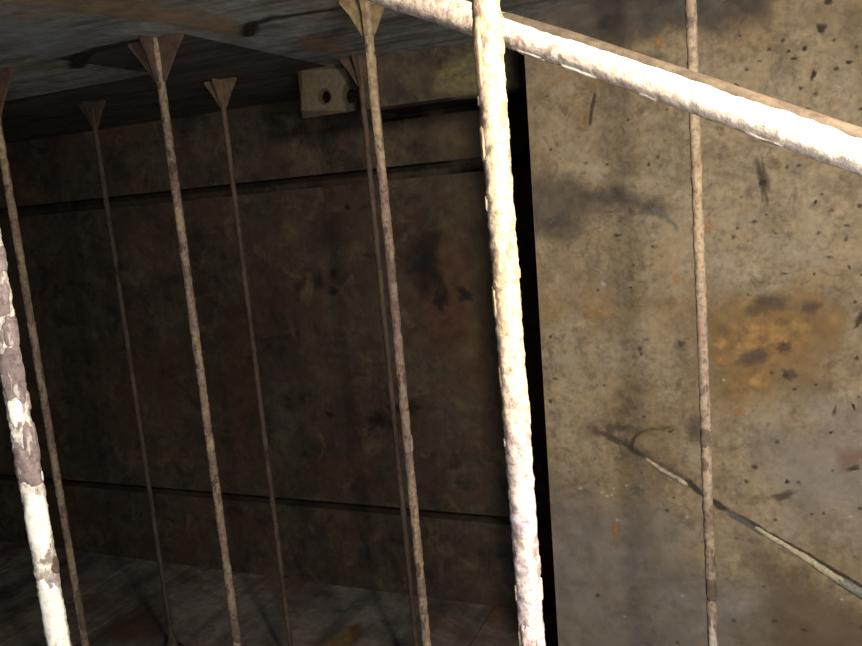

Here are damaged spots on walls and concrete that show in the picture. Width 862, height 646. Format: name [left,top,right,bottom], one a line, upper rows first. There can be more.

rust [711,294,841,399]
crack [645,458,862,599]